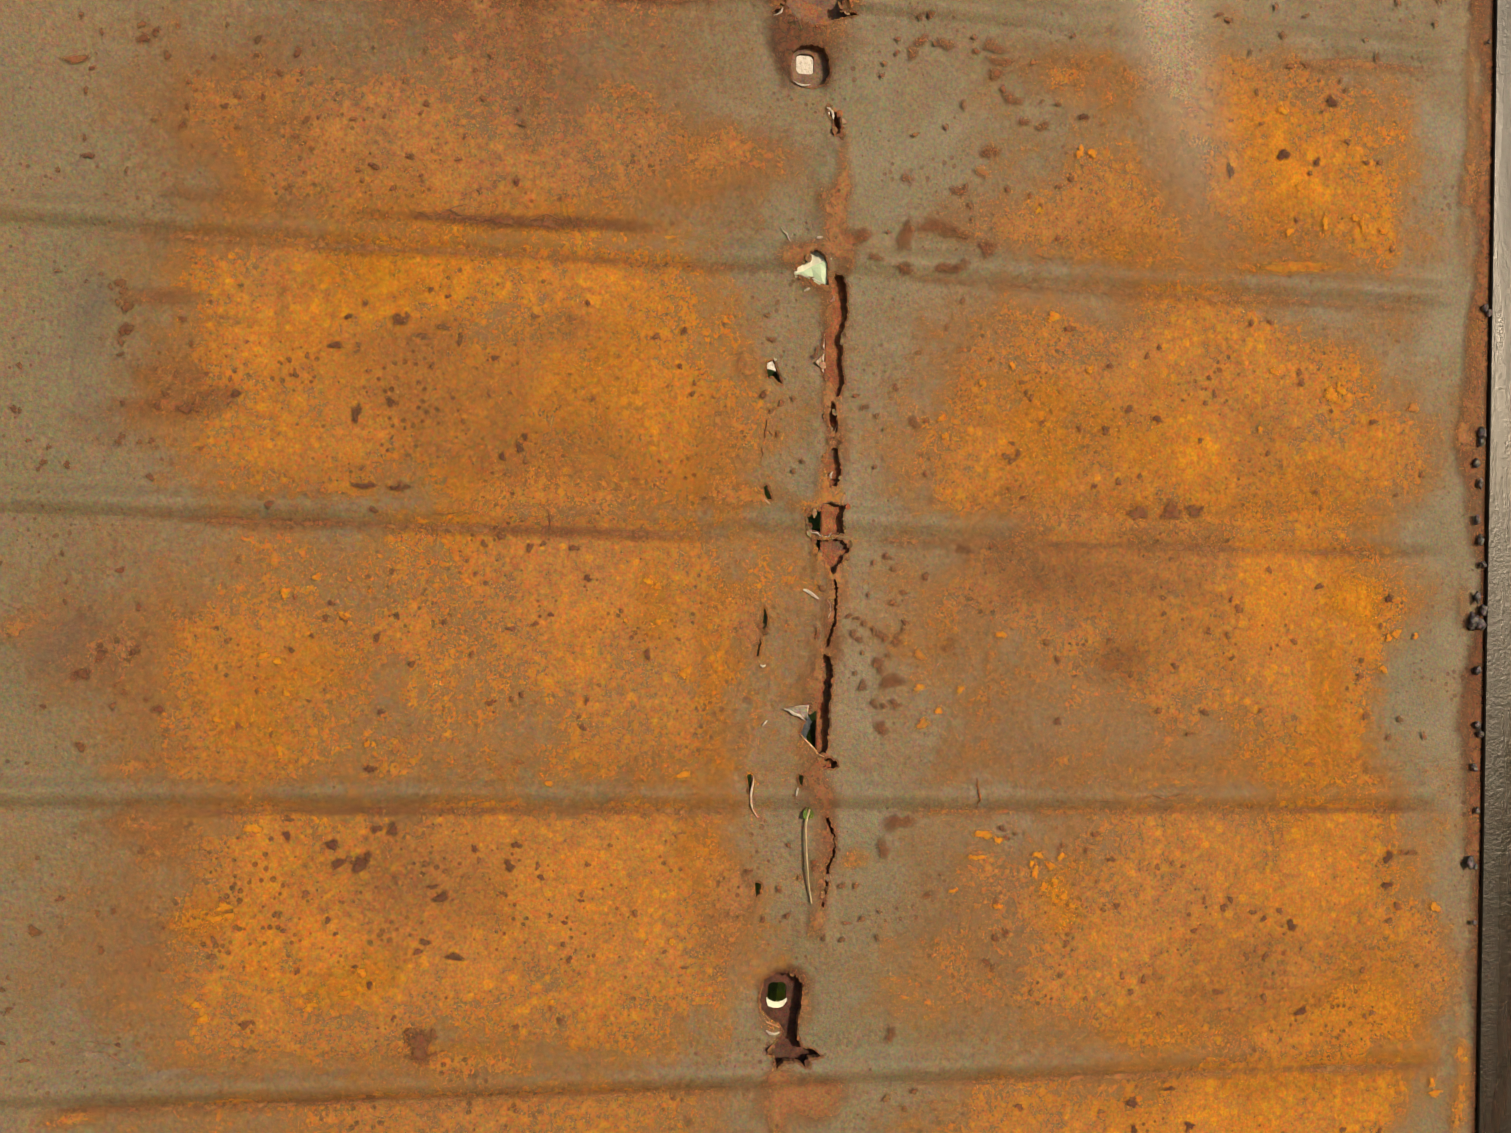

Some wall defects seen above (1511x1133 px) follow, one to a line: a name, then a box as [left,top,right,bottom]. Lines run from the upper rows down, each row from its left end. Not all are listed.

rust [768,0,862,85]
crack [825,103,847,140]
rust [781,147,862,327]
rust [139,0,849,1133]
crack [784,271,853,771]
rust [881,0,1493,1133]
crack [820,815,838,909]
rust [802,738,864,936]
rust [46,1112,95,1126]